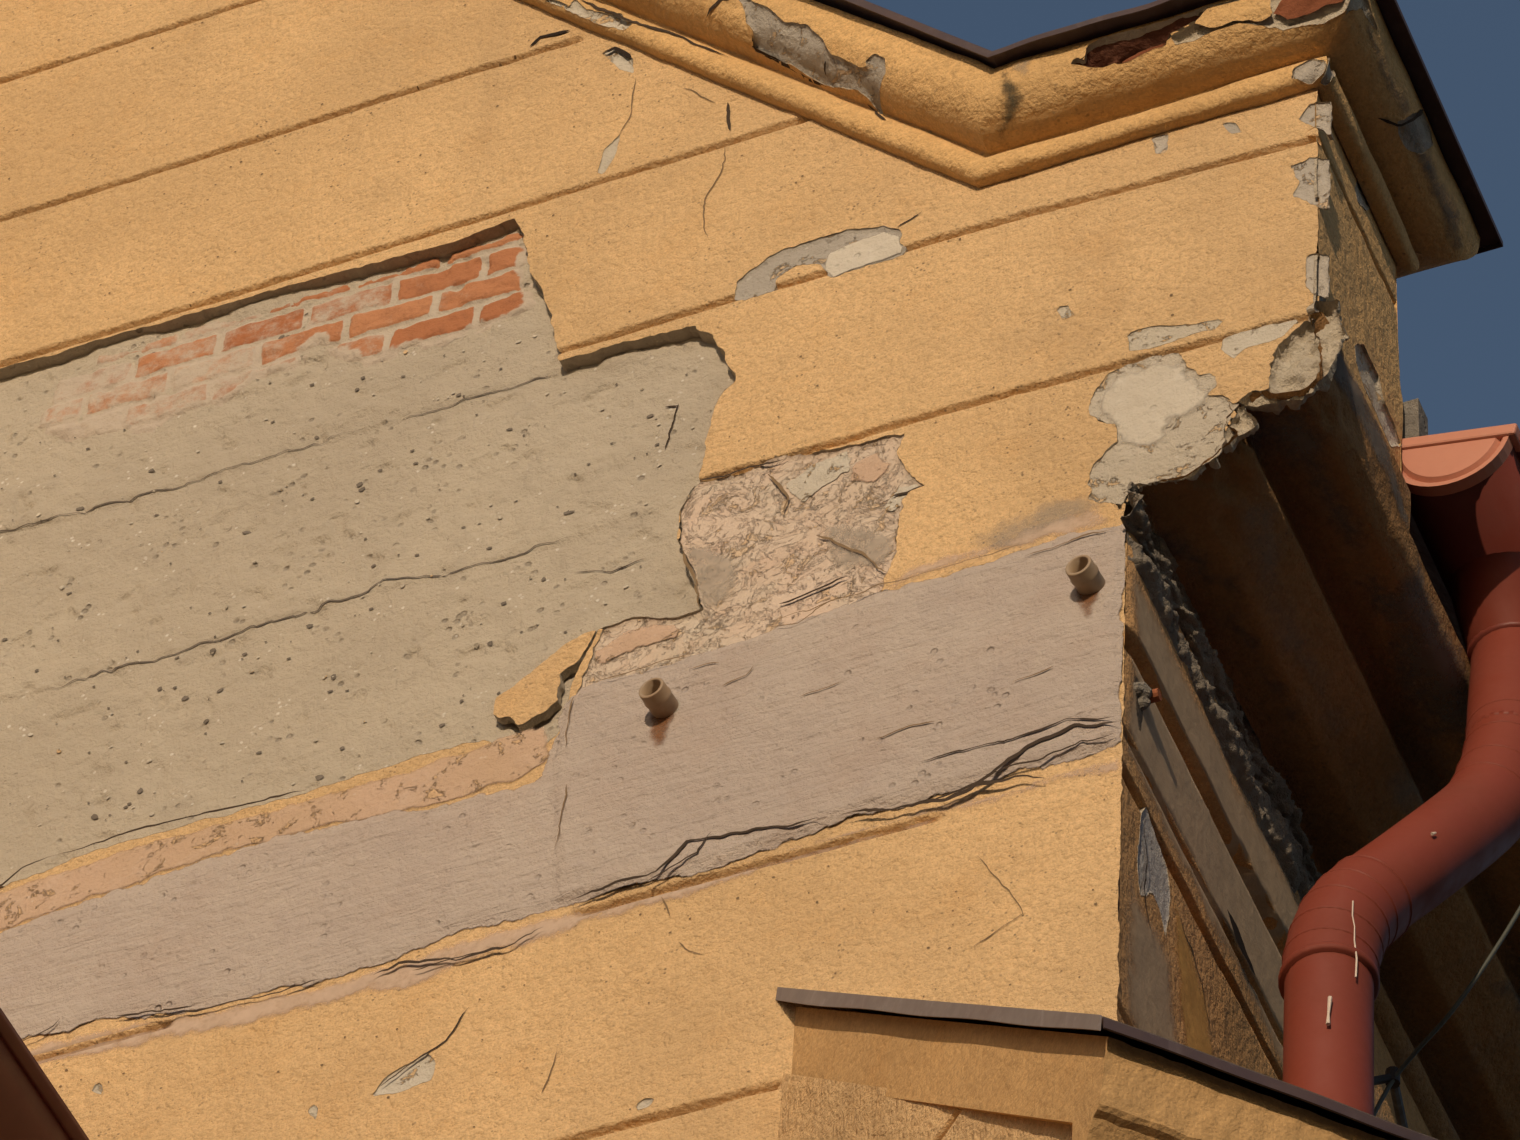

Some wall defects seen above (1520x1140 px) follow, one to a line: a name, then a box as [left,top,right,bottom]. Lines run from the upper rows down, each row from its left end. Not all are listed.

crack [621,80,636,131]
crack [530,0,826,87]
crack [685,88,731,236]
peeling [715,0,886,114]
flaking render [1071,0,1379,67]
peeling [1291,157,1331,210]
peeling [1291,58,1336,140]
water stain [1335,352,1407,521]
flaking render [0,219,925,887]
peeling [1087,253,1402,901]
water stain [1377,571,1468,742]
peeling [1137,807,1170,933]